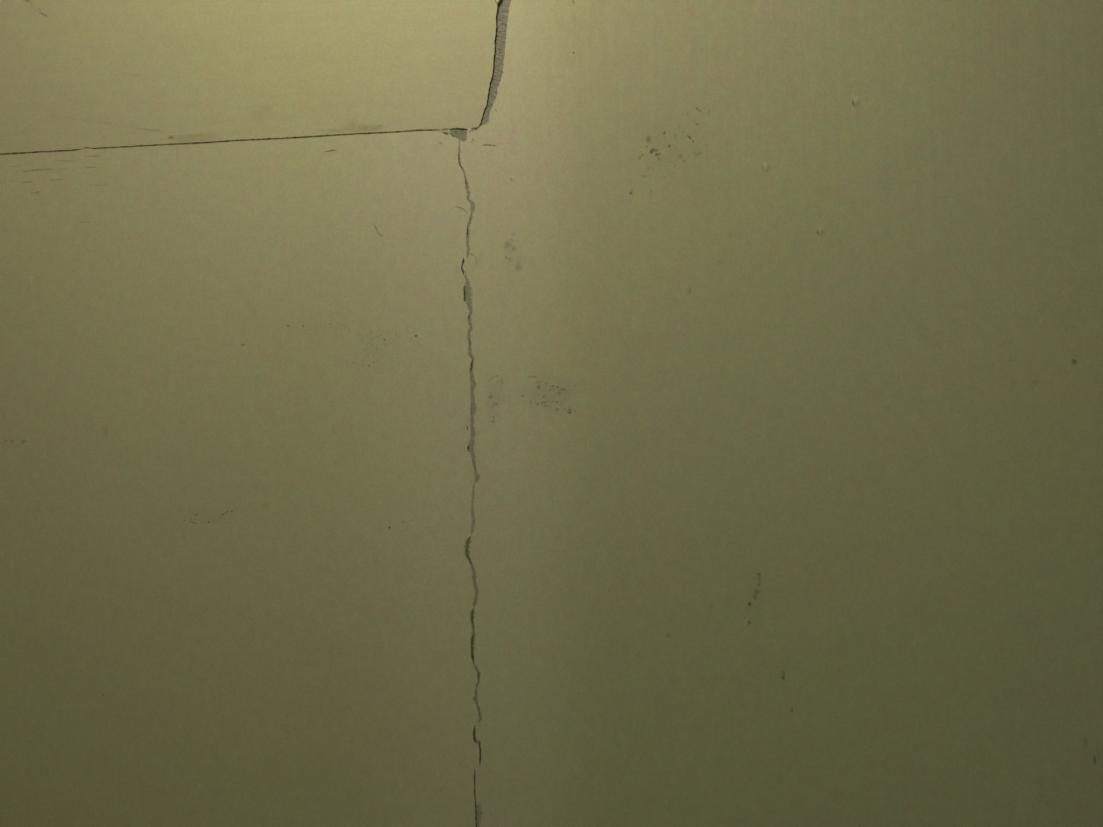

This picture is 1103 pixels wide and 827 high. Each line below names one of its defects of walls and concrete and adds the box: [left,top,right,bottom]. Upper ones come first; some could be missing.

crack [0,0,511,493]
crack [465,536,482,826]